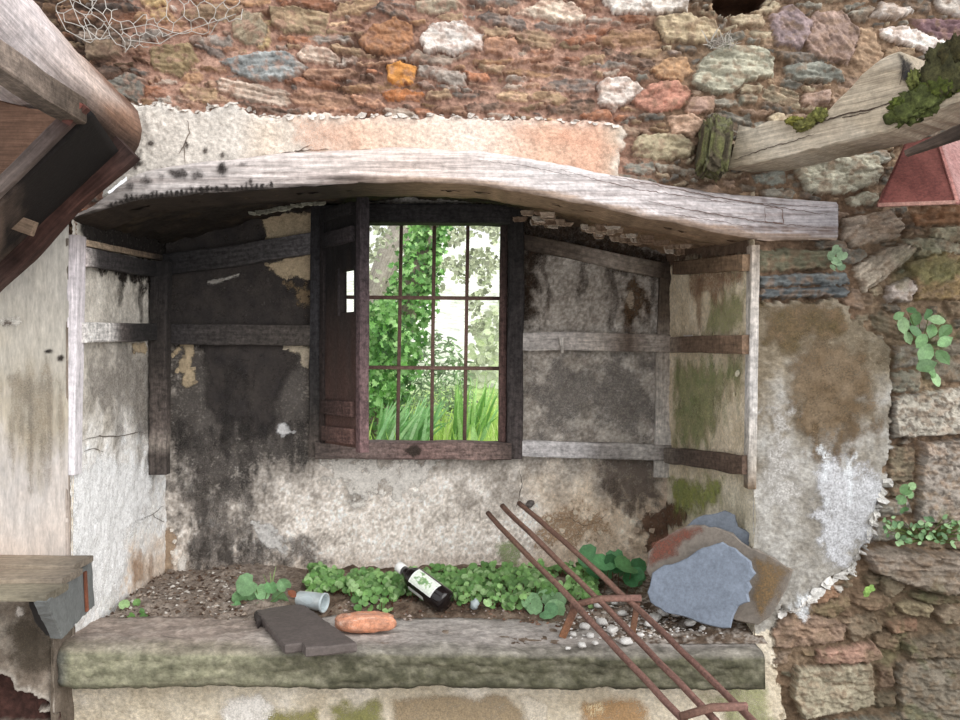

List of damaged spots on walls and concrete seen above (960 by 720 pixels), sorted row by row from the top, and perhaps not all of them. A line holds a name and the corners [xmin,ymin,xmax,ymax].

peeling [264,255,310,306]
peeling [171,344,198,387]
water stain [176,421,263,570]
water stain [797,595,808,621]
water stain [759,301,884,567]
spalling [777,478,893,619]